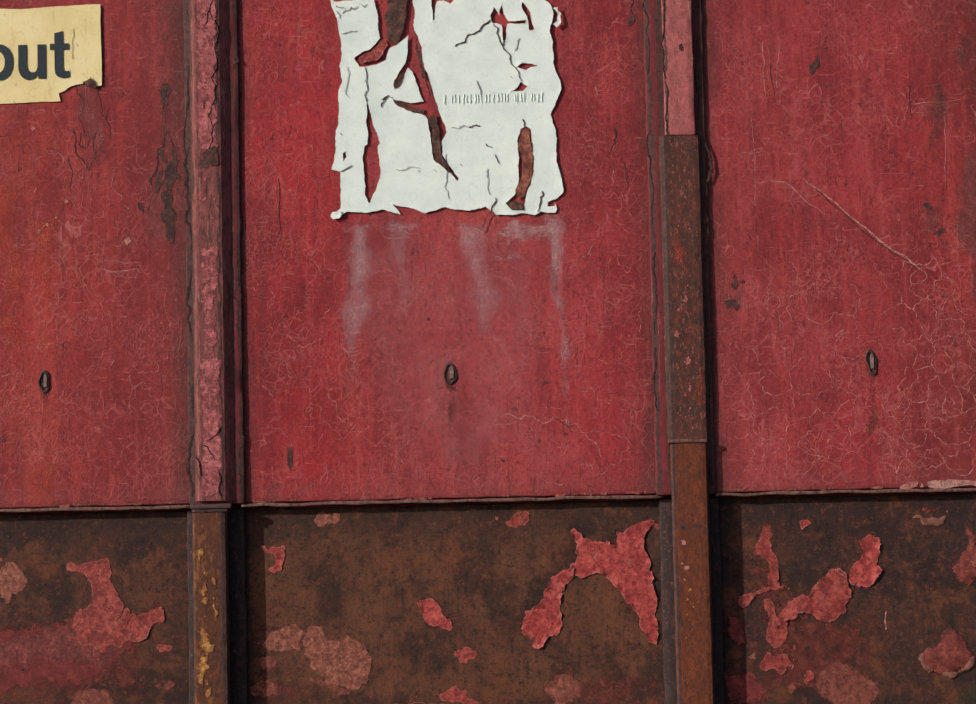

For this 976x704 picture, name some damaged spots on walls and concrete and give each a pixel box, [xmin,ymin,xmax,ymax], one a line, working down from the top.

peeling [195,0,219,150]
crack [694,0,703,113]
crack [18,0,219,339]
peeling [138,148,182,250]
peeling [199,245,223,497]
crack [186,378,292,500]
crack [705,257,864,479]
crack [877,257,976,479]
peeling [0,558,173,704]
peeling [249,624,372,697]
peeling [521,520,660,649]
peeling [724,524,883,704]